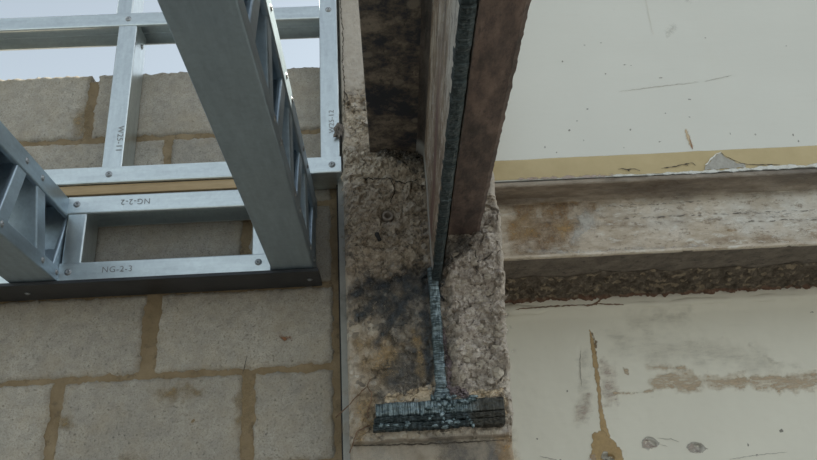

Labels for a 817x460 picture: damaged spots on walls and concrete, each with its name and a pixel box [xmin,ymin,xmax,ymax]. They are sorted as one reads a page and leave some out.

peeling [647,152,817,175]
spalling [446,213,509,416]
spalling [384,383,433,403]
damp [644,366,817,393]